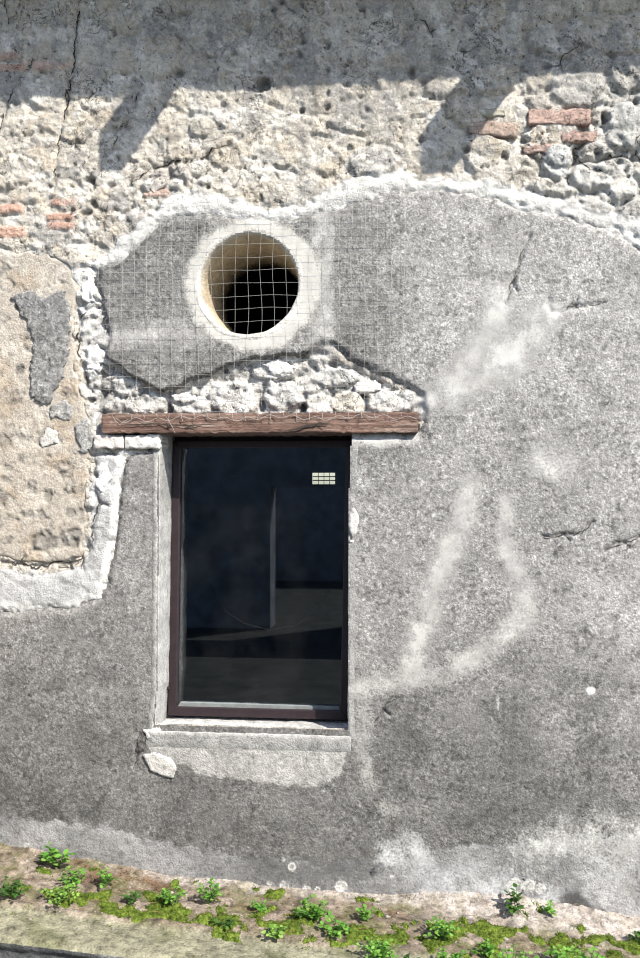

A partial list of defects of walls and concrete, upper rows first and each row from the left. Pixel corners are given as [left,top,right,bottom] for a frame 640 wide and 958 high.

crack [53,1,80,176]
crack [130,143,229,184]
crack [567,128,640,185]
water stain [410,281,568,417]
spalling [0,251,418,564]
water stain [352,433,418,453]
water stain [527,446,577,481]
crack [5,493,108,569]
water stain [348,475,539,785]
water stain [277,833,516,895]
water stain [513,817,640,859]
water stain [538,884,608,913]